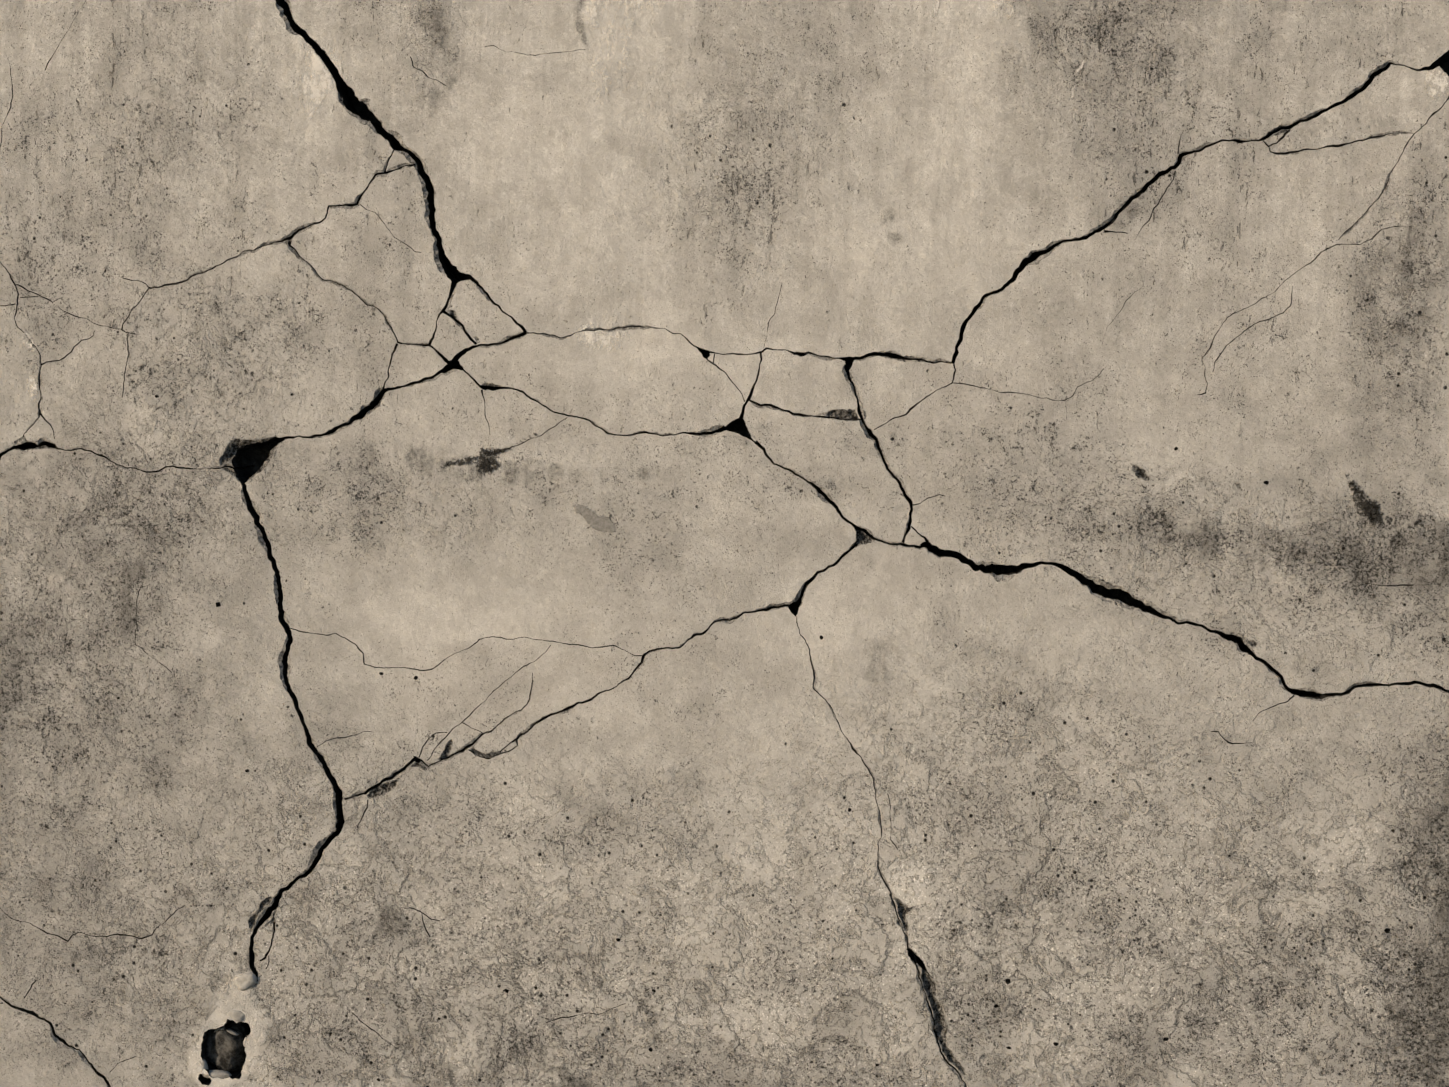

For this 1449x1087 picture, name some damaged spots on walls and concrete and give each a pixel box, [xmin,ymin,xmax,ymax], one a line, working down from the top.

crack [0,67,13,147]
crack [0,262,193,473]
crack [121,0,586,982]
crack [344,50,1449,1087]
crack [0,905,185,942]
crack [0,980,136,1087]